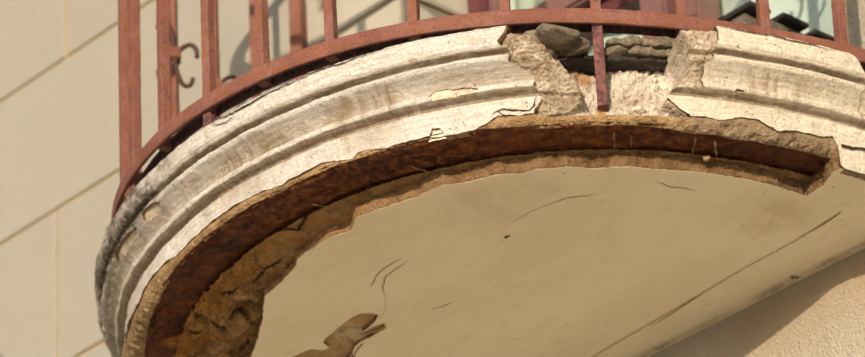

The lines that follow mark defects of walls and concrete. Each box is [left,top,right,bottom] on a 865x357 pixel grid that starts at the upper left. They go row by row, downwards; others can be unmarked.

crack [841,89,865,150]
spalling [118,30,837,357]
crack [371,259,408,316]
crack [593,212,841,357]